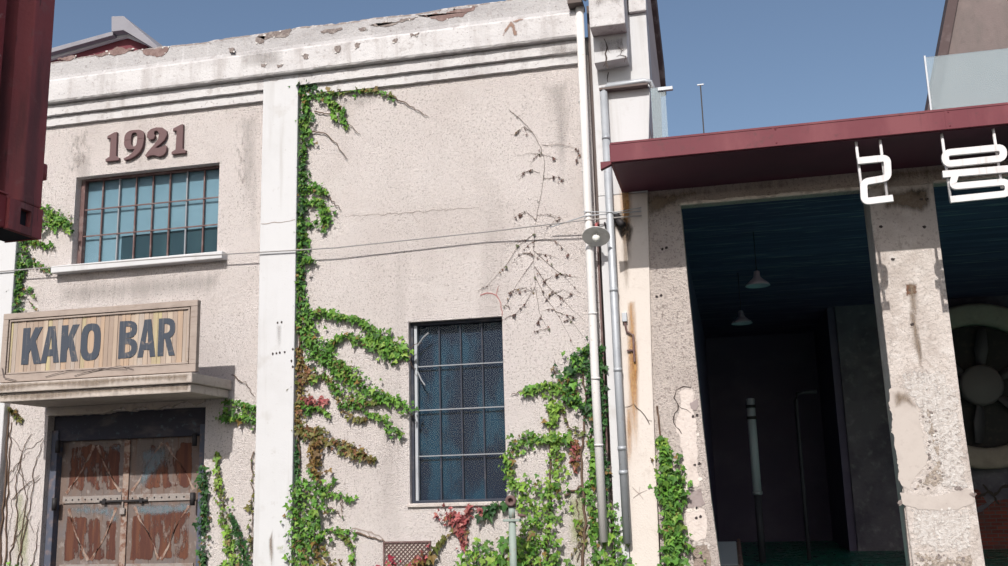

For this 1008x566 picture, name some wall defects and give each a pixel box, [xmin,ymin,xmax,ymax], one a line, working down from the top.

spalling [359,6,476,31]
spalling [255,28,292,44]
spalling [94,46,170,57]
rust [629,304,637,416]
peeling [675,388,711,566]
peeling [889,370,1008,566]
crack [977,484,1008,505]